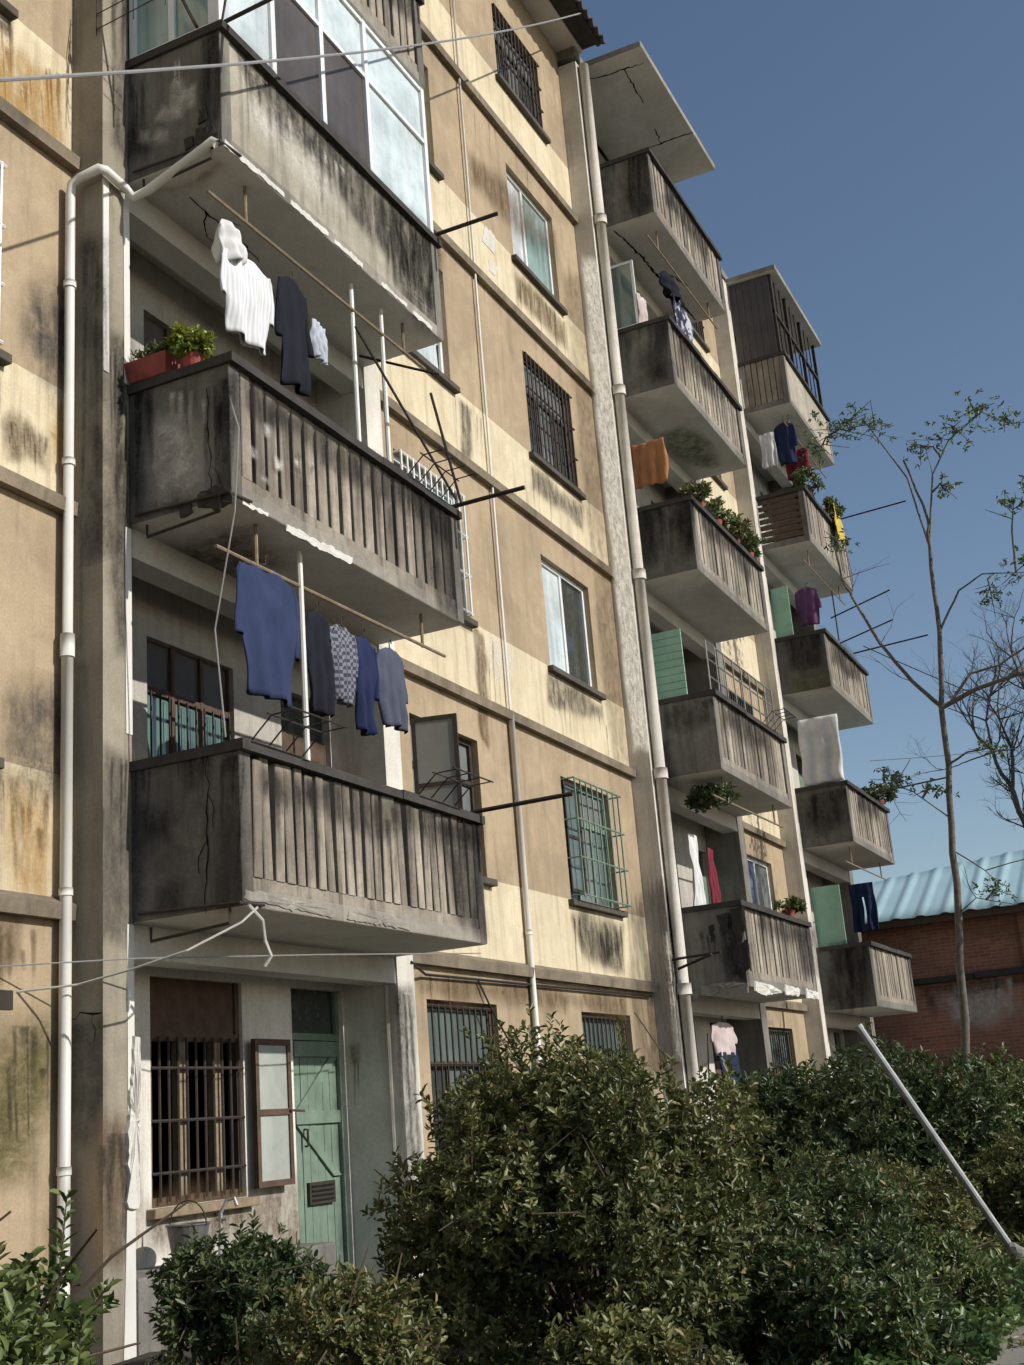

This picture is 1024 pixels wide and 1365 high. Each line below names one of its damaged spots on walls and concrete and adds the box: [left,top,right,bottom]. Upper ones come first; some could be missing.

corrosion [0,54,60,137]
leakage [162,38,220,118]
crack [590,63,693,148]
leakage [244,58,442,331]
leakage [6,421,41,458]
leakage [185,534,272,571]
leakage [205,374,510,743]
leakage [103,759,166,931]
leakage [221,754,246,903]
leakage [266,771,486,927]
leakage [574,912,622,967]